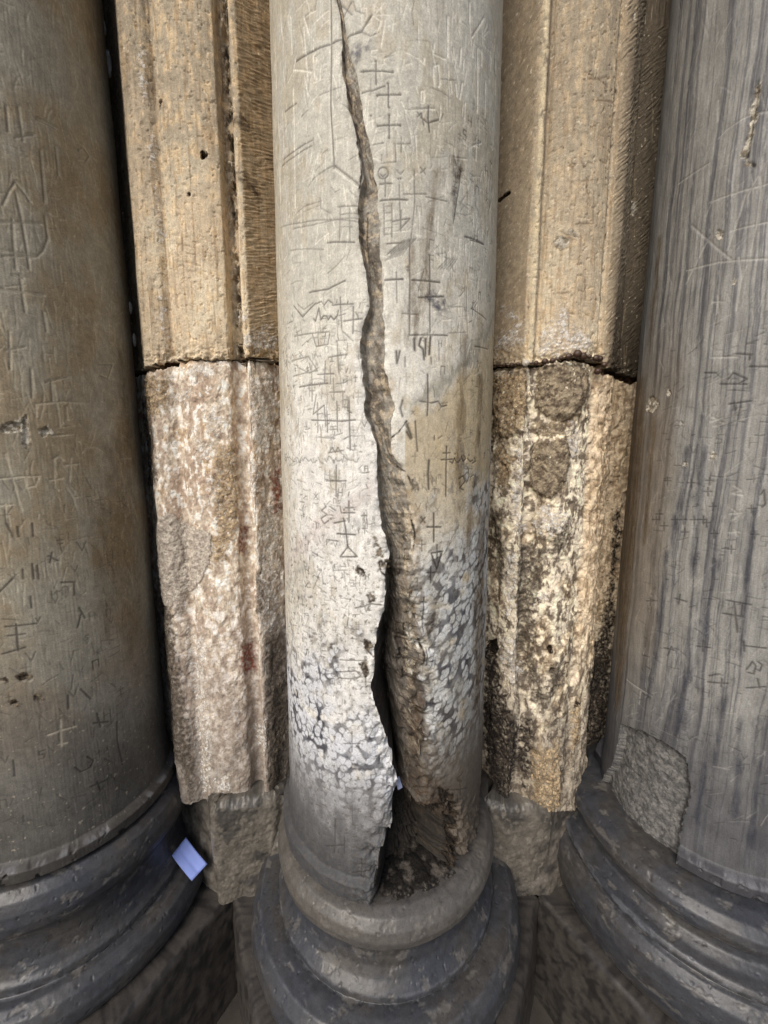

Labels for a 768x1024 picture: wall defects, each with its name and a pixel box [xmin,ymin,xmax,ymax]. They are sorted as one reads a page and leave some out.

crack [135,351,279,377]
crack [493,358,637,386]
crack [337,0,454,898]
peeling [406,623,417,674]
leakage [476,513,505,604]
leakage [476,617,534,798]
leakage [514,527,568,703]
leakage [586,381,653,753]
spalling [377,787,458,900]
spalling [602,723,691,864]